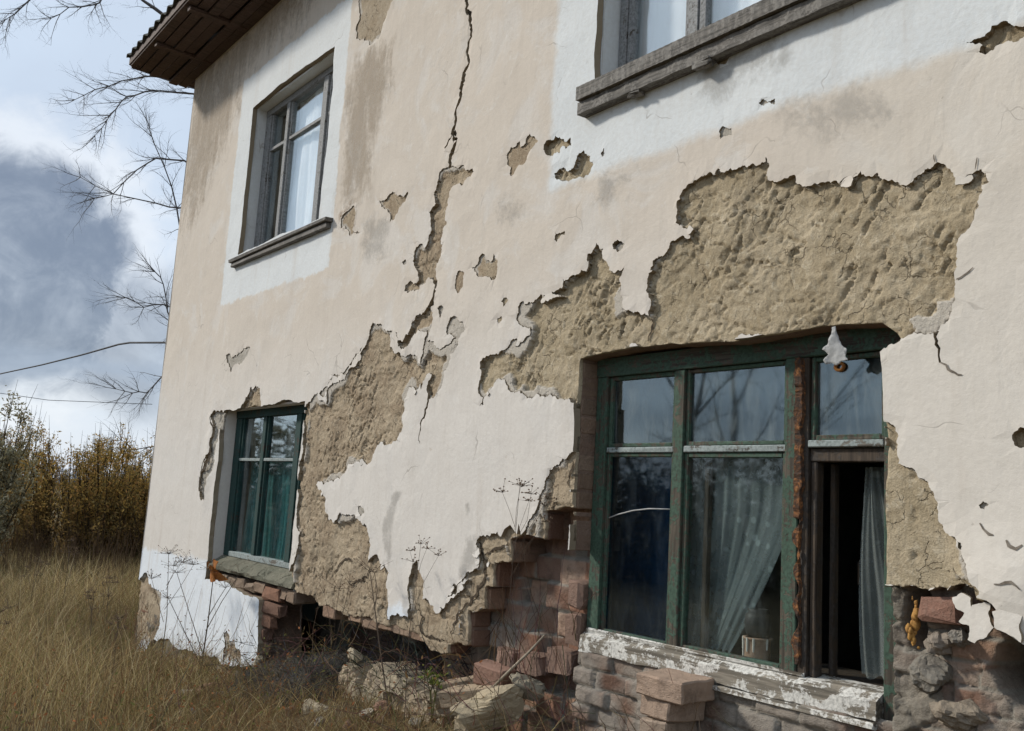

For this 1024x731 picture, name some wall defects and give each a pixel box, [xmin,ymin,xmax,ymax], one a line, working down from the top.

peeling [357,0,393,45]
flaking render [975,24,1024,55]
peeling [507,135,571,176]
flaking render [555,152,604,181]
peeling [381,192,408,220]
flaking render [480,162,989,408]
crack [939,346,962,375]
flaking render [200,387,261,498]
flaking render [292,306,580,654]
flaking render [135,573,161,648]
flaking render [696,422,1024,731]
flaking render [571,651,659,731]